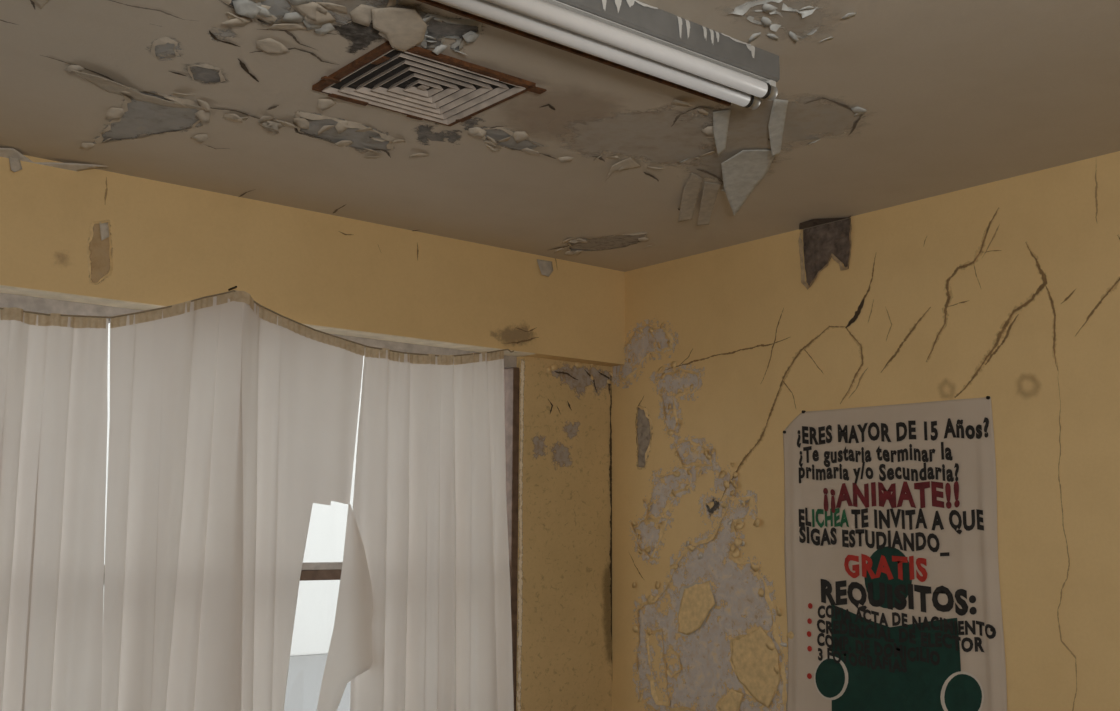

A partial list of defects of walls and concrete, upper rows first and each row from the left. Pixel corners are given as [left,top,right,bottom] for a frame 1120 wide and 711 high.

peeling [209,0,483,56]
peeling [730,0,834,43]
peeling [41,55,556,159]
peeling [0,148,108,172]
peeling [677,99,788,226]
peeling [86,220,113,284]
spalling [798,216,852,290]
crack [666,207,1120,501]
peeling [517,360,613,711]
peeling [629,406,794,711]